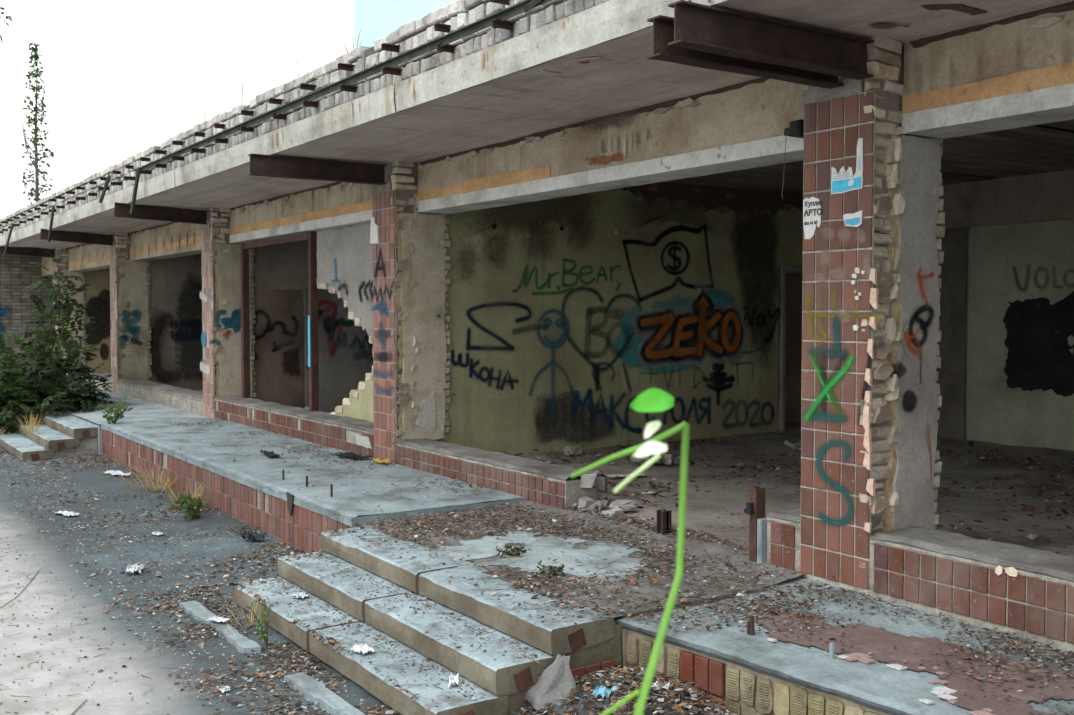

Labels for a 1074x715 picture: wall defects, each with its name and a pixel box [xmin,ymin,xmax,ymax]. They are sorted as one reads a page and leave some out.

spalling [246,243,257,397]
flaking render [210,182,362,334]
spalling [330,365,373,415]
leakage [485,195,587,267]
flaking render [370,77,770,290]
flaking render [613,182,803,221]
flaking render [851,1,1074,533]
peeling [838,653,958,705]